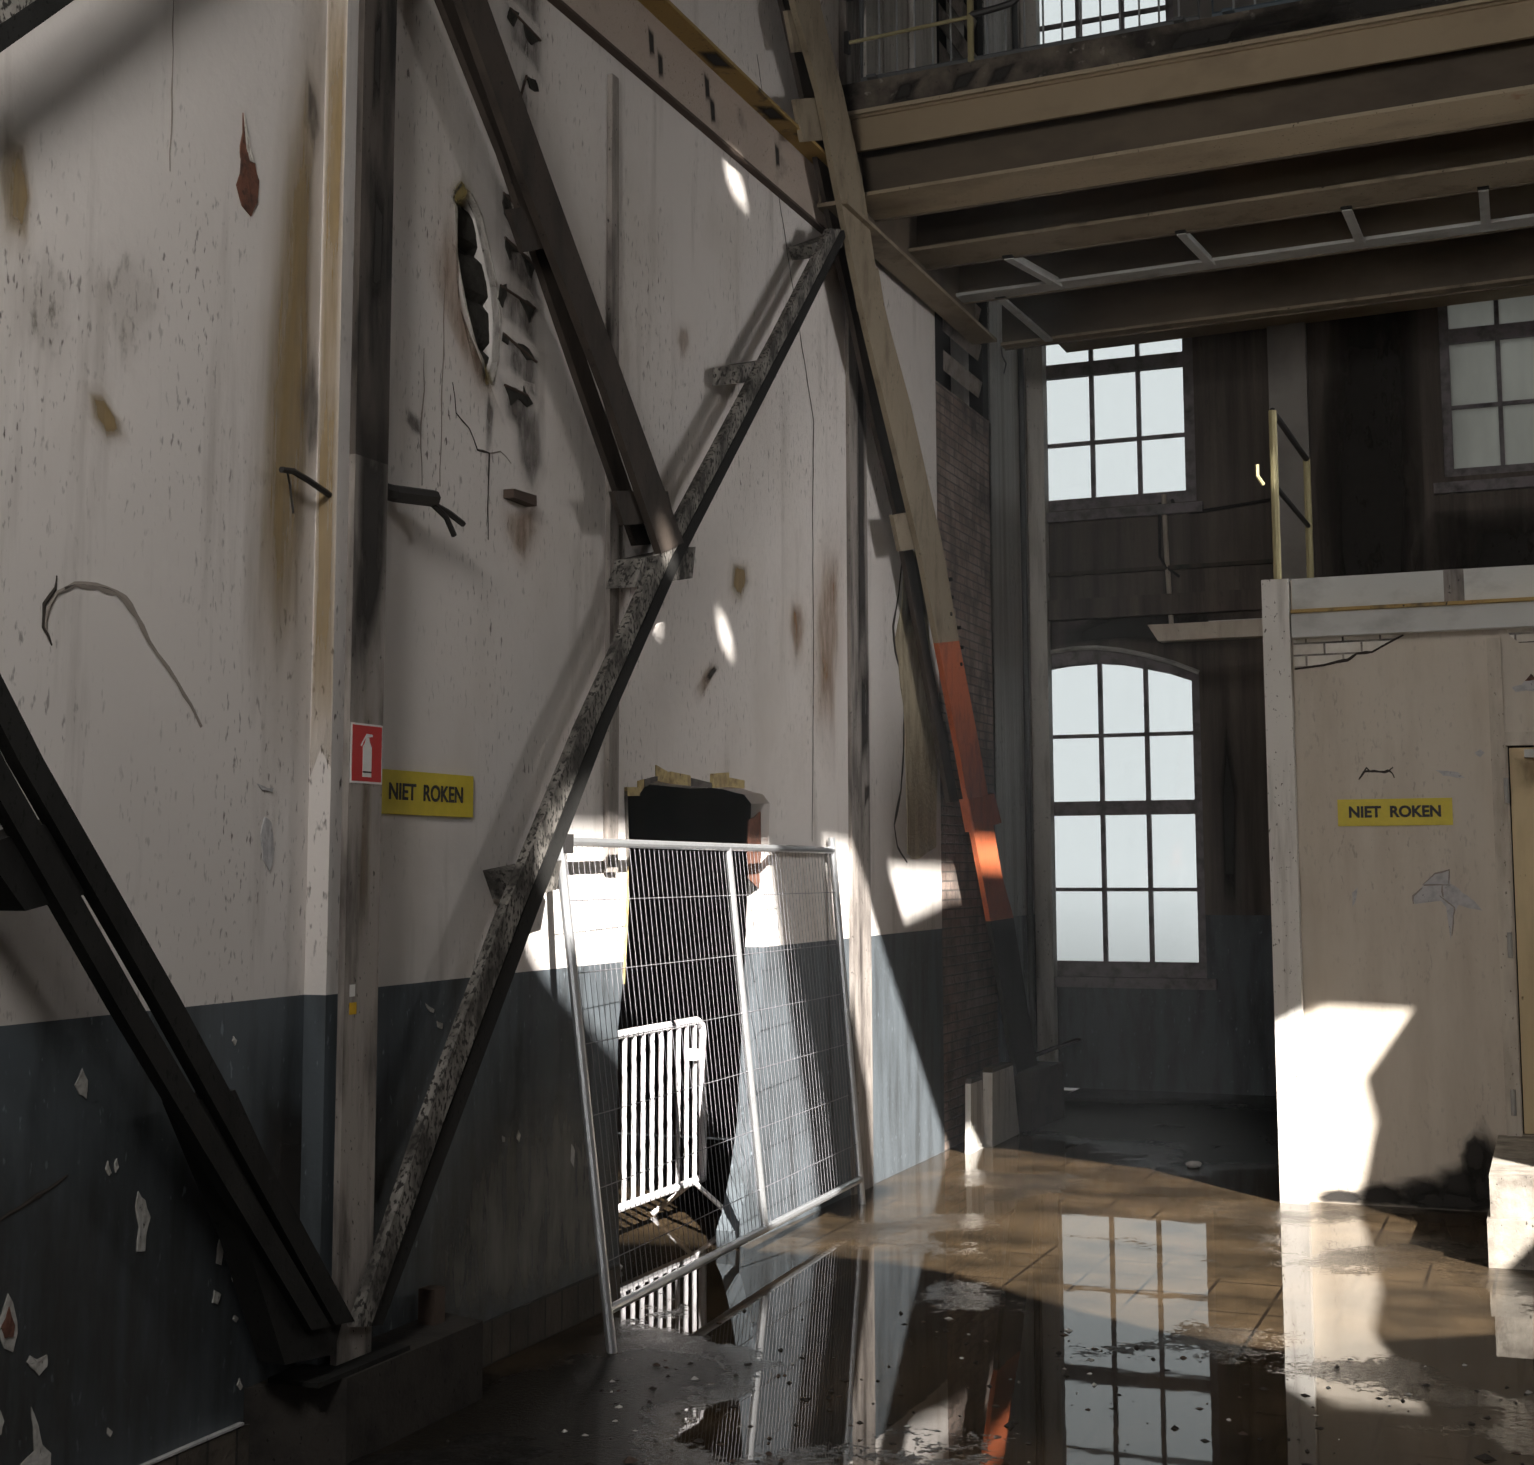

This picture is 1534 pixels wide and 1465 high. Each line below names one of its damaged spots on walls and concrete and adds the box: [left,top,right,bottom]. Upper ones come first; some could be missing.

crack [42,575,202,728]
spalling [1293,635,1404,670]
peeling [1412,869,1482,939]
peeling [75,1068,88,1099]
peeling [105,1158,119,1176]
peeling [135,1191,151,1252]
peeling [212,1239,233,1304]
peeling [0,1294,48,1375]
peeling [20,1407,51,1465]